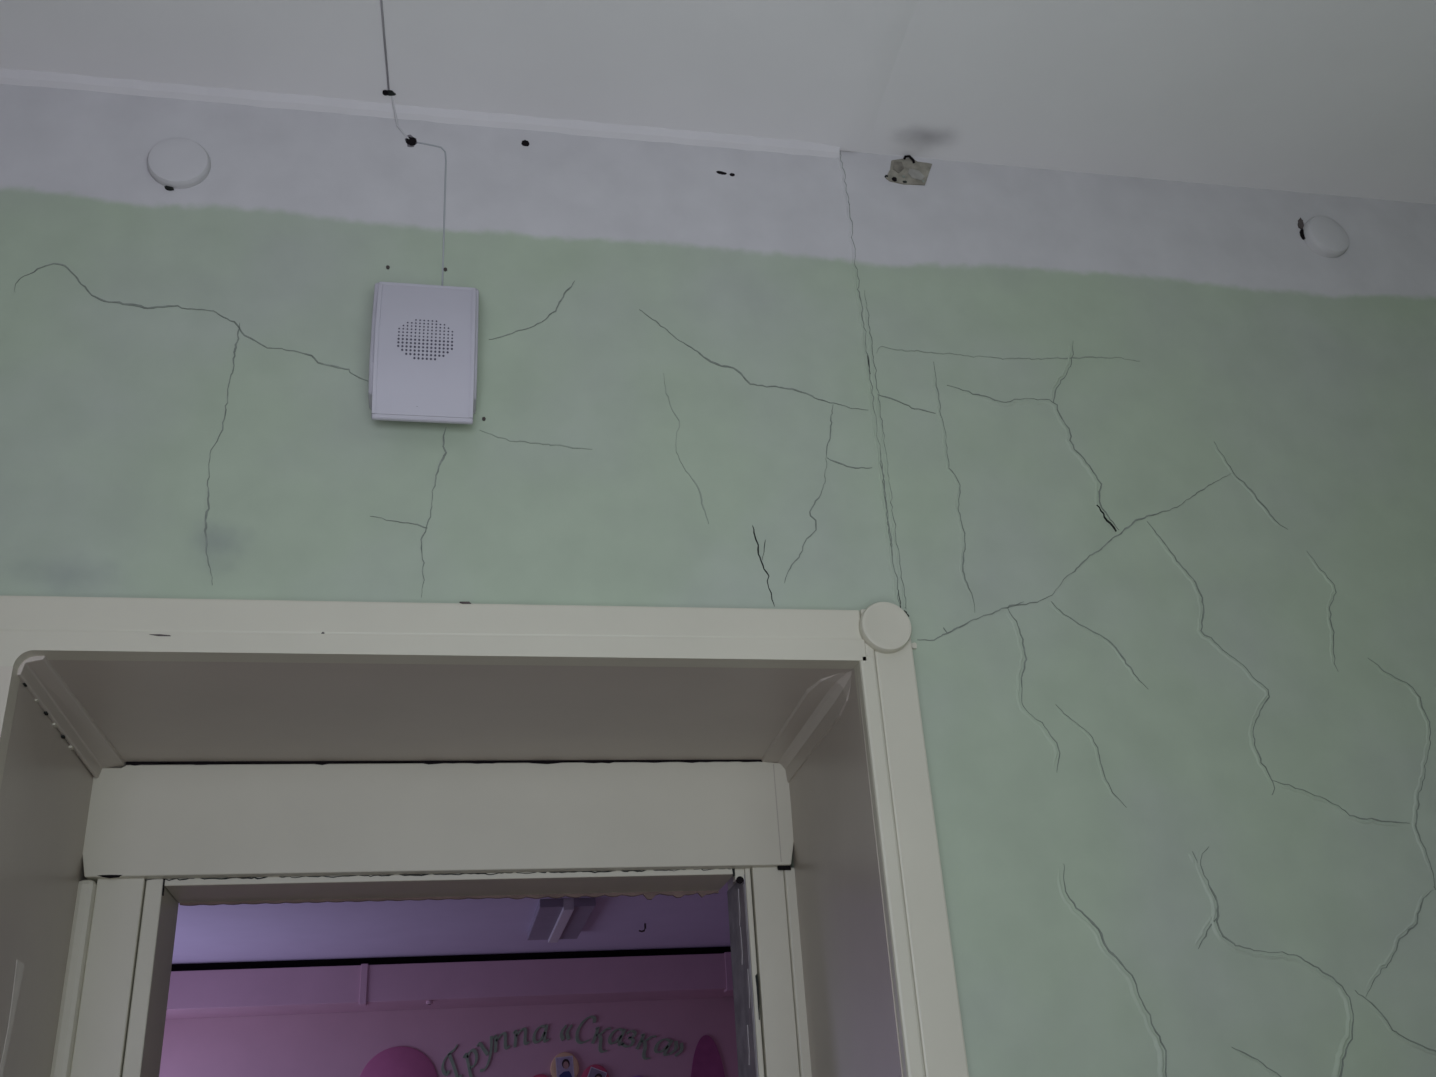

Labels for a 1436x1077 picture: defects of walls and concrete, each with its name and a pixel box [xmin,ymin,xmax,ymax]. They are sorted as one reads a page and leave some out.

crack [14,263,368,585]
crack [370,428,447,598]
crack [480,430,592,450]
crack [639,151,1436,1077]